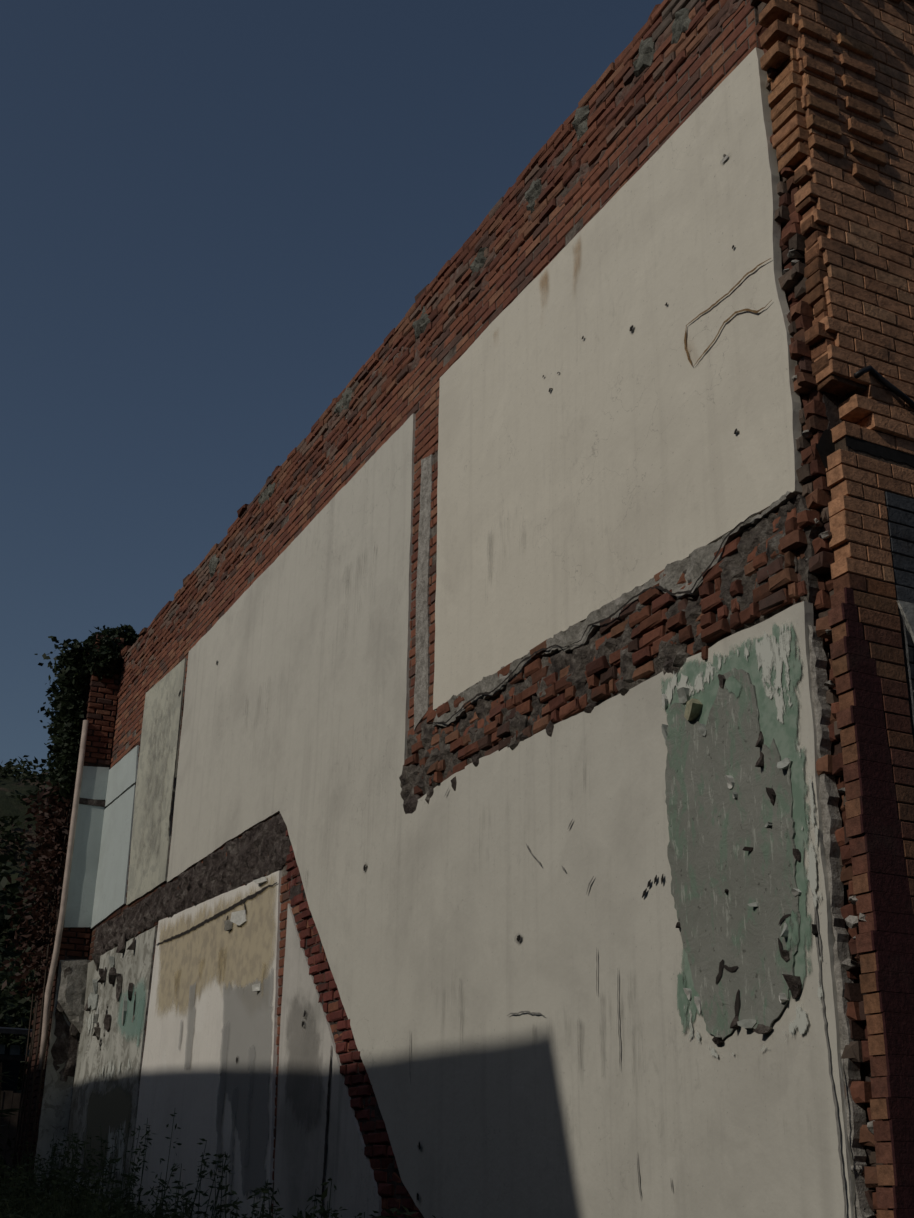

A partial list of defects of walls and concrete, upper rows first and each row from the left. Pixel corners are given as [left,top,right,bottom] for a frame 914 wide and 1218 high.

crack [684,258,771,367]
peeling [399,491,875,1218]
leakage [159,880,274,1204]